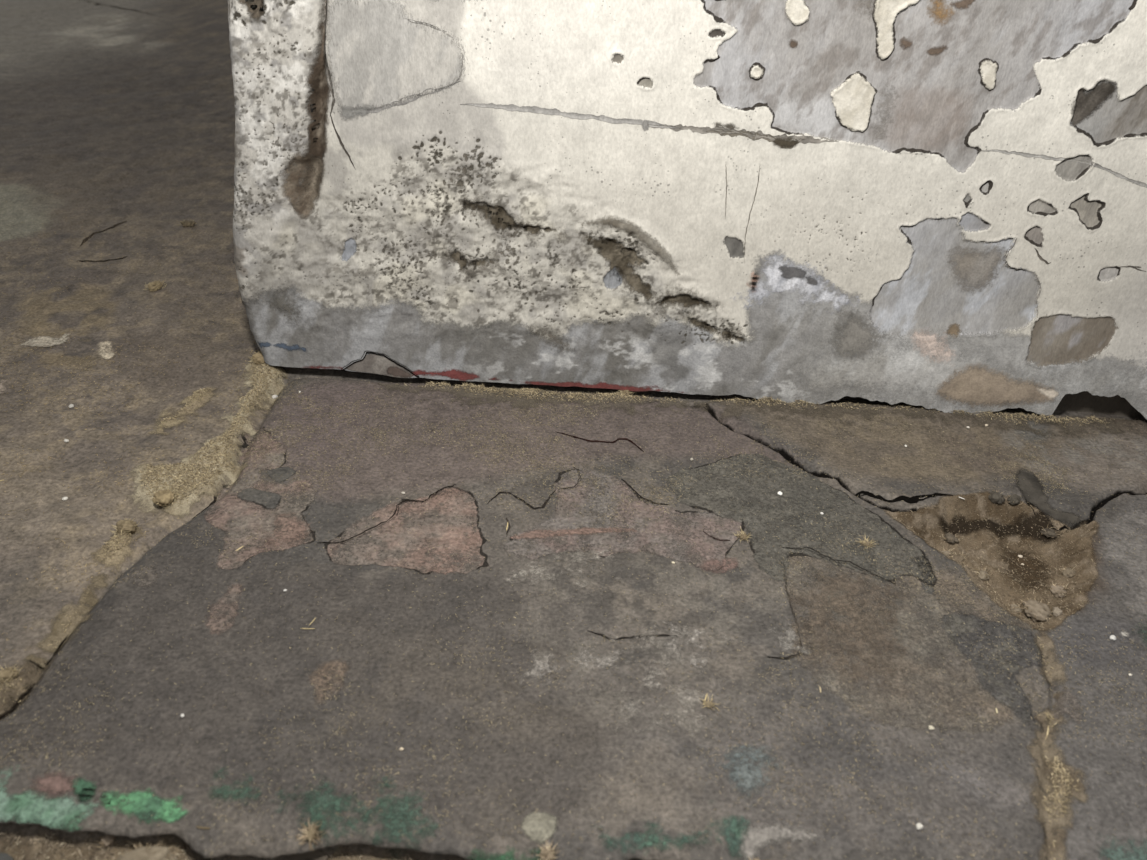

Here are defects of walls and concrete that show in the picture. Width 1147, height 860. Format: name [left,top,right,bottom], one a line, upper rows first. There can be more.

flaking render [234,103,319,233]
peeling [693,0,1137,173]
peeling [1055,79,1147,181]
peeling [239,131,1147,419]
crack [318,484,456,544]
crack [487,467,581,537]
crack [555,431,644,452]
crack [621,479,669,505]
crack [686,403,953,512]
crack [1025,491,1147,536]
crack [587,630,677,640]
crack [767,547,896,659]